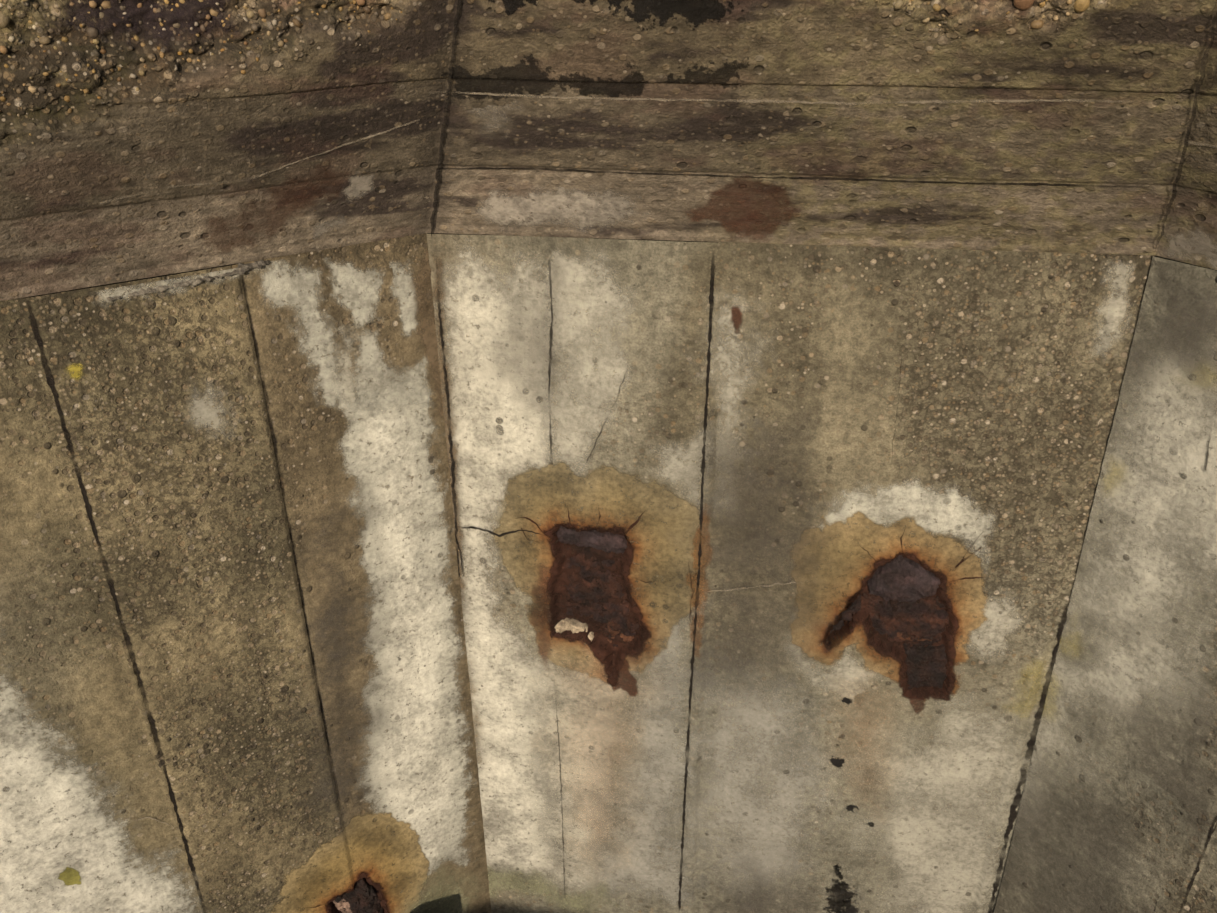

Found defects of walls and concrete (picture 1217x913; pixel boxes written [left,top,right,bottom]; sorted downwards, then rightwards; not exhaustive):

spalling [0,0,412,150]
water stain [488,0,540,16]
water stain [574,0,744,31]
rust [693,179,797,239]
water stain [662,314,739,507]
water stain [0,682,194,913]
rust [270,813,429,913]
water stain [316,250,694,903]
rust [493,462,710,696]
rust [789,511,987,695]
rust [910,698,926,713]
water stain [818,349,1217,913]